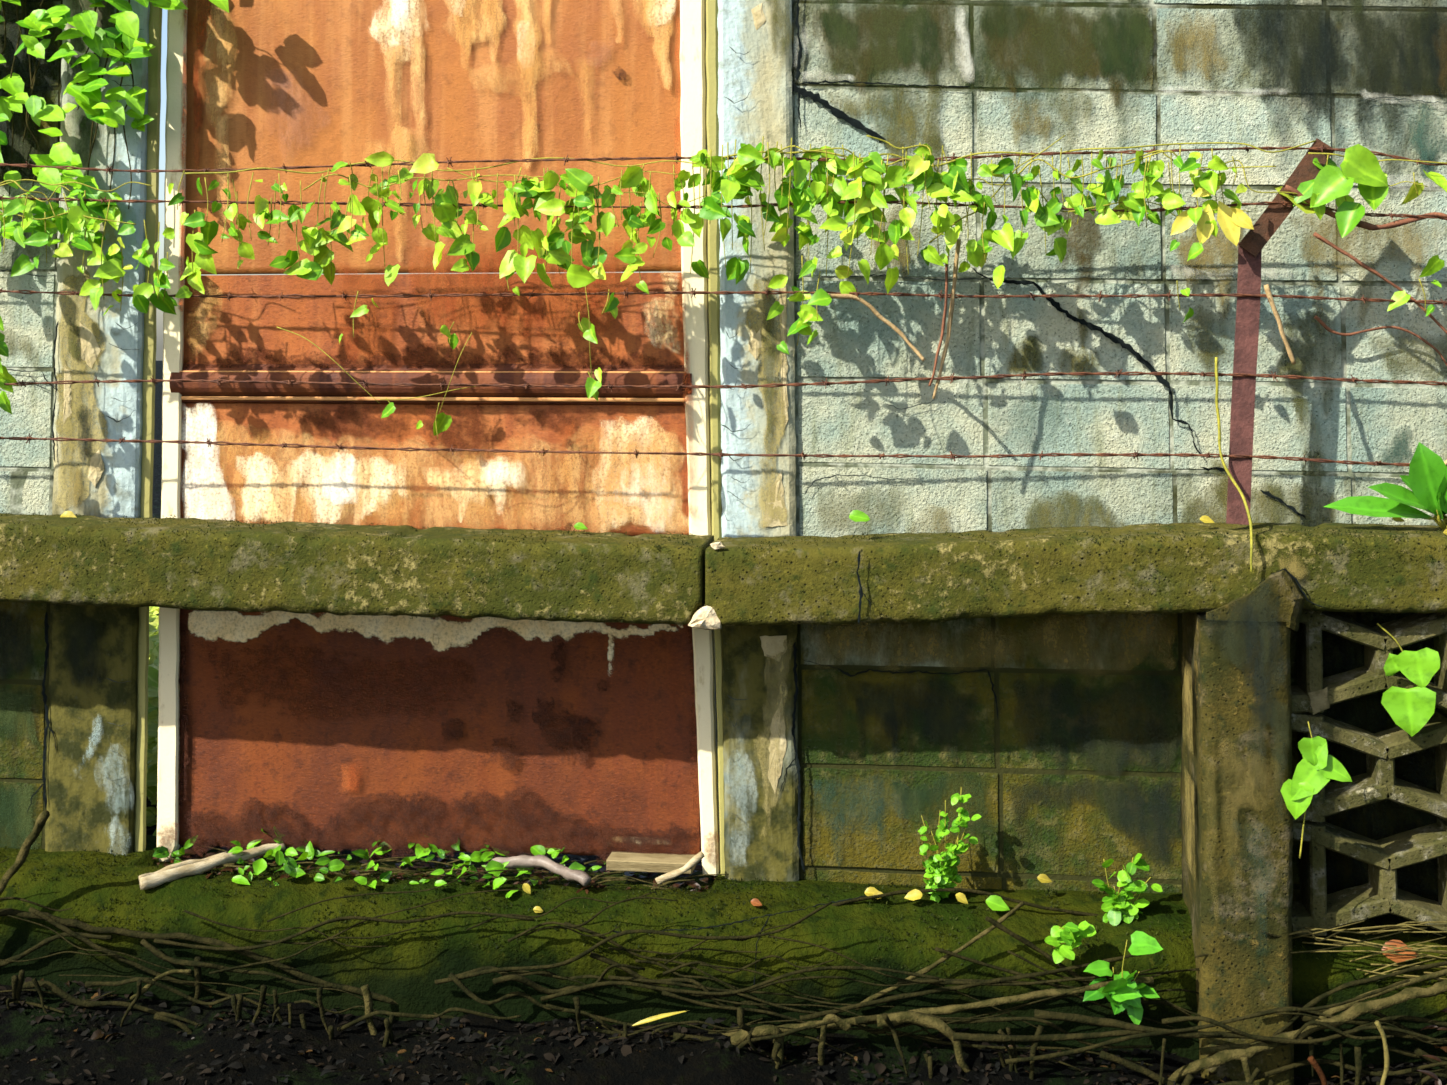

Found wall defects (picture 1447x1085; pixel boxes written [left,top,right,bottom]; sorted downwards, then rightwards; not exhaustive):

corrosion [181,0,213,165]
crack [792,0,968,143]
leakage [820,0,1153,171]
leakage [1232,0,1447,184]
flaking render [55,271,108,510]
corrosion [294,406,406,438]
corrosion [184,247,691,409]
crack [817,267,1225,472]
crack [1260,490,1306,519]
peeling [188,606,722,669]
corrosion [157,625,718,864]
leakage [1014,675,1183,861]